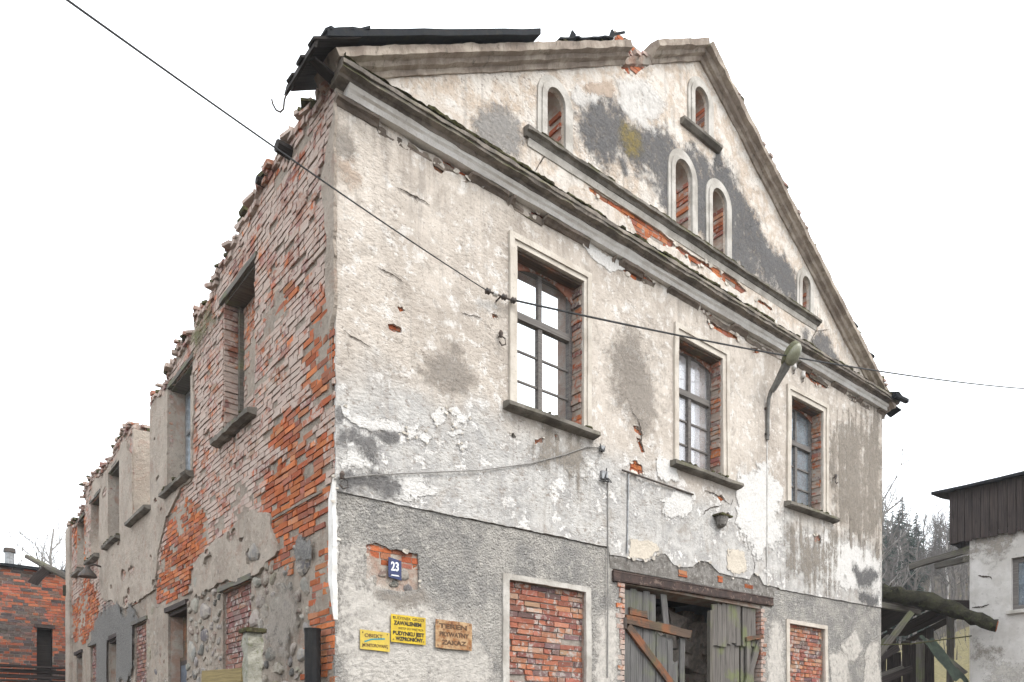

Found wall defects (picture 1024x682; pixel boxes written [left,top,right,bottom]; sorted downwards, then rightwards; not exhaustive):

flaking render [583,188,745,293]
spalling [263,279,299,323]
spalling [156,497,209,604]
spalling [261,298,472,682]
flaking render [630,424,644,475]
peeling [609,456,784,598]
leakage [780,405,885,596]